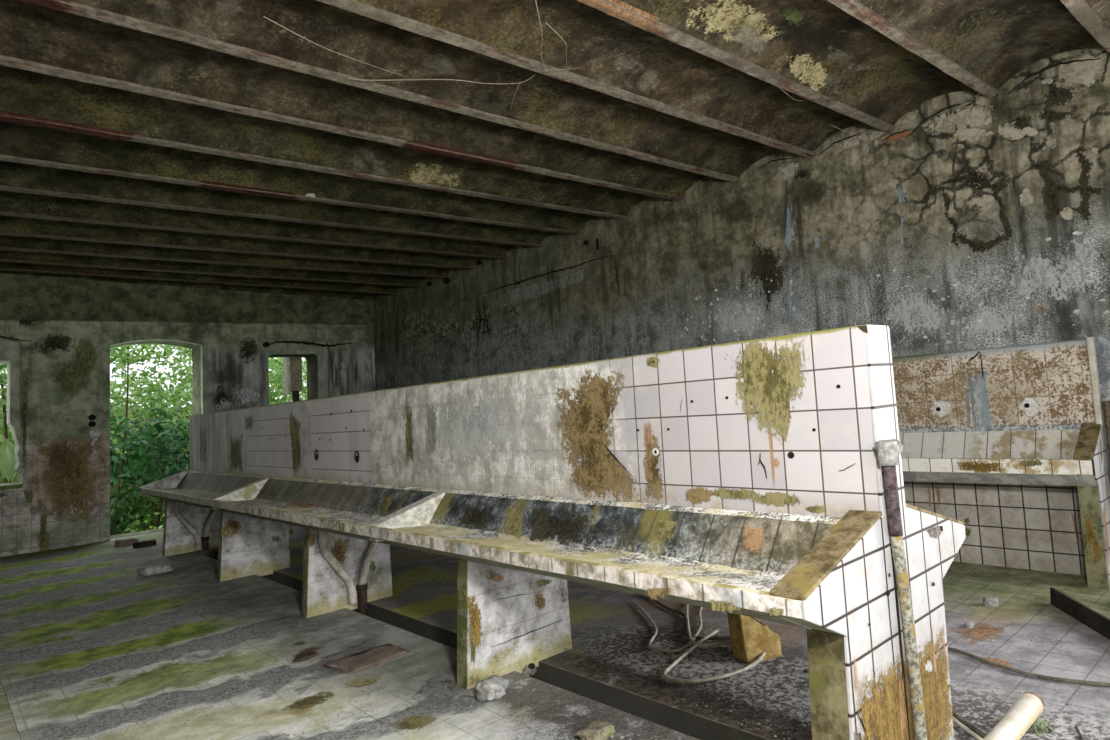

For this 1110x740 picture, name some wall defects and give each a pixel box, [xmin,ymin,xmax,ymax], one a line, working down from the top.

water stain [904,59,961,91]
crack [1008,58,1100,94]
water stain [469,88,511,117]
crack [910,100,971,135]
crack [757,131,865,170]
spalling [969,194,995,210]
spalling [1020,187,1034,206]
water stain [741,168,825,321]
water stain [594,374,613,426]
water stain [778,370,791,433]
water stain [24,435,96,551]
rust [898,666,906,738]